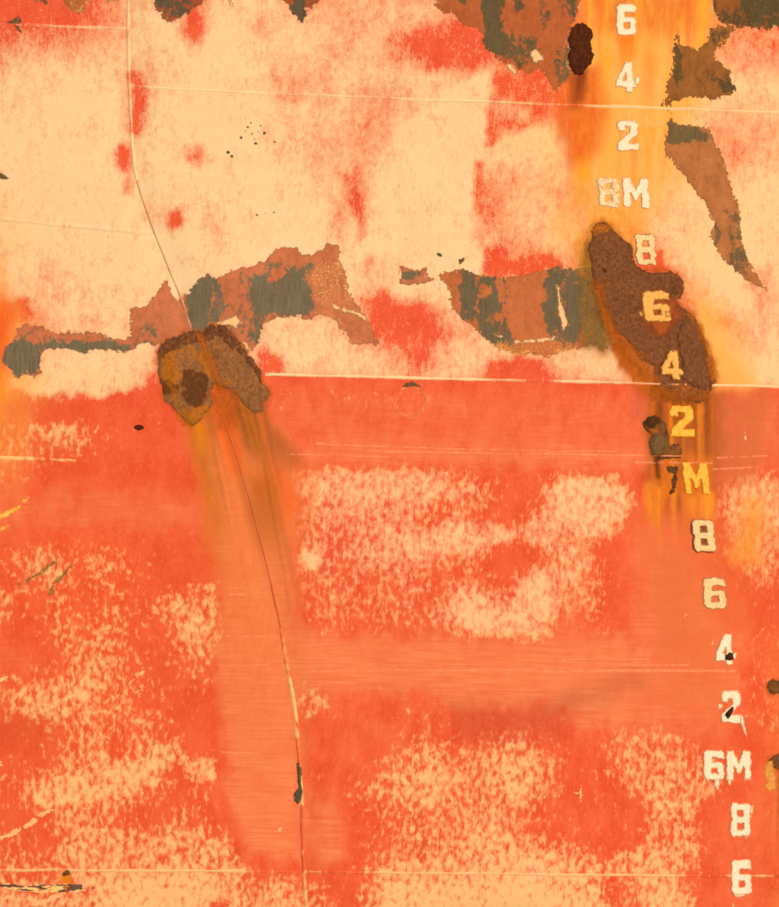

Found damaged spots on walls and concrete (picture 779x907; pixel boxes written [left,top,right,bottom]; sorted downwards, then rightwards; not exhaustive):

peeling [63,0,94,15]
peeling [154,0,205,23]
peeling [281,0,319,23]
peeling [433,0,580,92]
peeling [661,0,779,291]
peeling [2,243,380,379]
peeling [399,258,608,358]
corrosion [543,0,779,907]
corrosion [157,324,323,843]